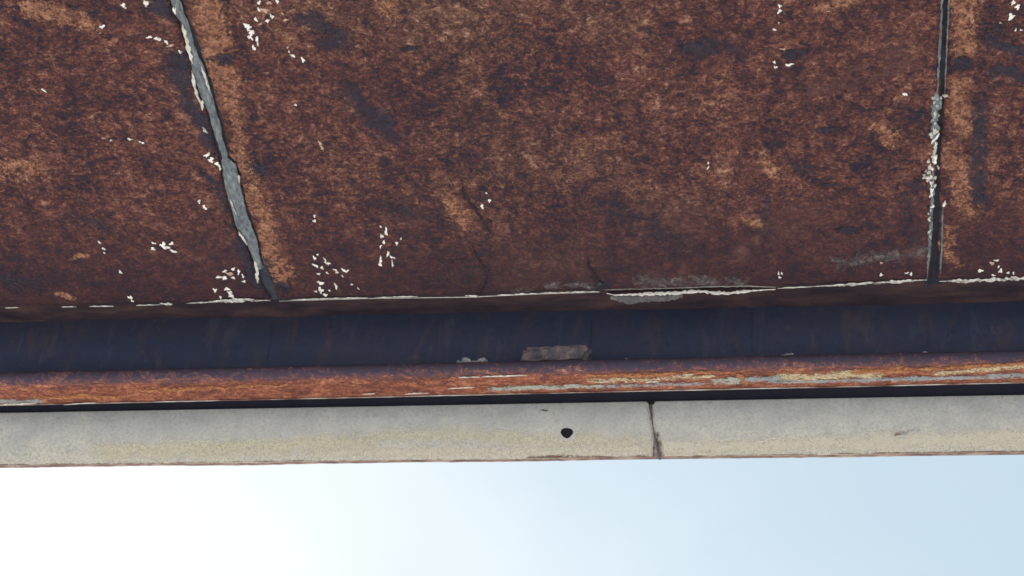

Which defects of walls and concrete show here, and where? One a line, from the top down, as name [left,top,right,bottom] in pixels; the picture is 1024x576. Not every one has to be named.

corrosion [13,0,101,35]
peeling [243,0,289,50]
corrosion [949,0,984,57]
corrosion [946,74,974,135]
corrosion [191,0,294,283]
corrosion [0,158,51,183]
corrosion [442,193,473,231]
corrosion [950,156,980,219]
peeling [186,260,271,304]
peeling [293,254,922,305]
peeling [488,373,1024,392]
crack [646,400,663,460]